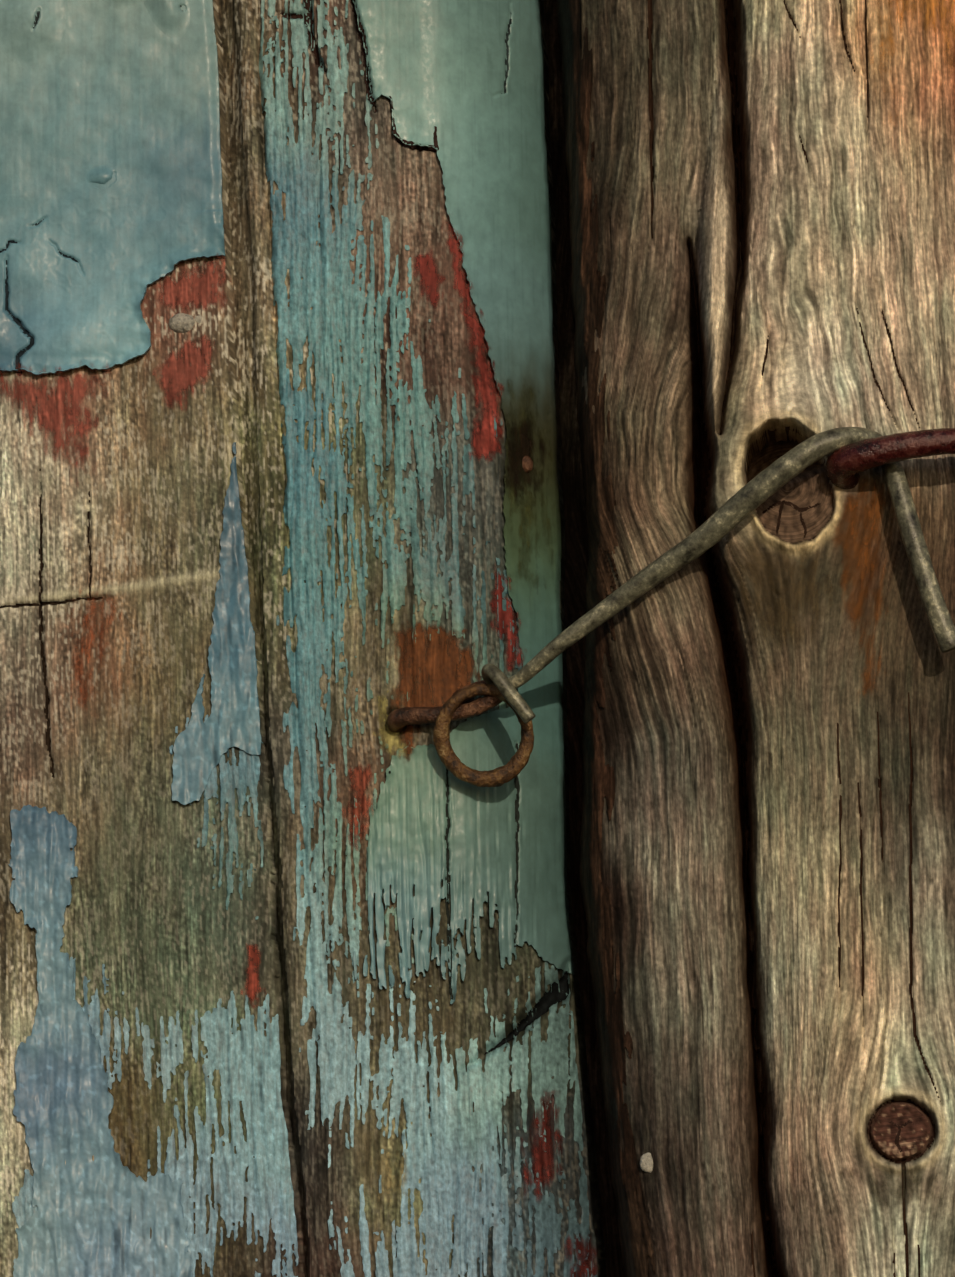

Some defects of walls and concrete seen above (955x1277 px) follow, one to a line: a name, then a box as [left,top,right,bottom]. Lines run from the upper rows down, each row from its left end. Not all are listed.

crack [280,0,326,73]
crack [350,0,439,153]
crack [0,219,44,376]
crack [0,469,104,778]
peeling [169,442,264,910]
rust [400,724,421,759]
peeling [259,0,597,1277]
rust [391,623,480,709]
peeling [8,805,299,1277]